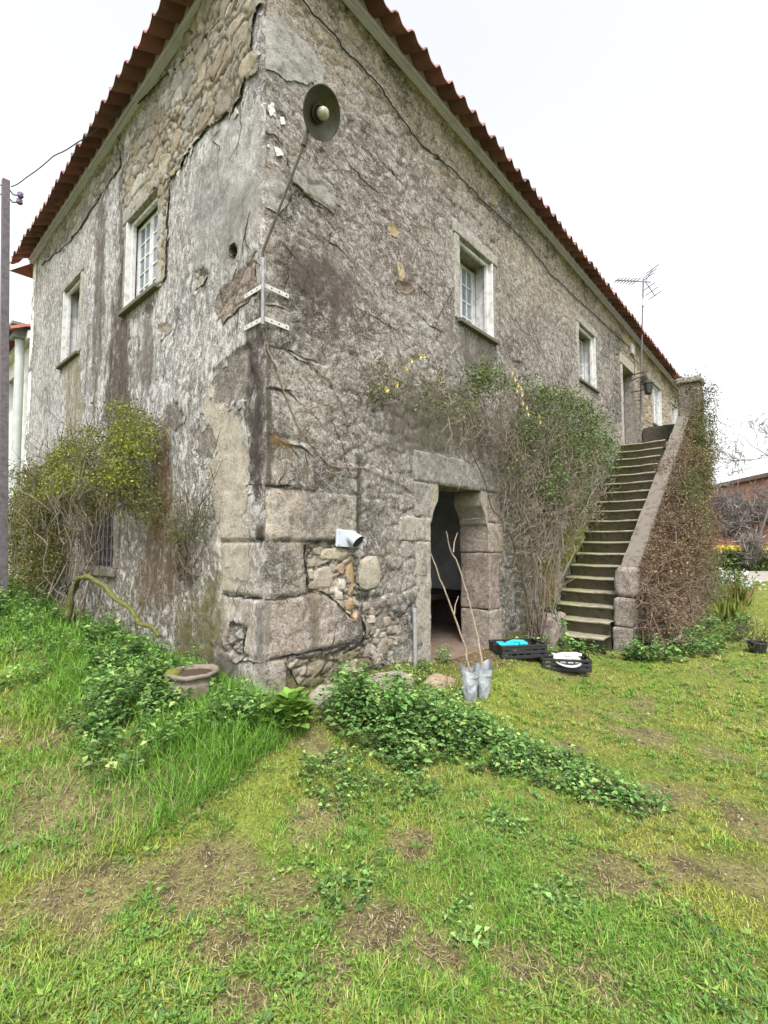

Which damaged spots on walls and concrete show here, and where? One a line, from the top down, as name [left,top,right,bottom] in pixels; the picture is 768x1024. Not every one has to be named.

flaking render [41,0,326,290]
crack [211,101,283,165]
crack [345,158,405,193]
crack [242,207,281,268]
damp [65,201,153,437]
flaking render [214,242,260,325]
flaking render [393,261,416,295]
crack [416,283,455,333]
damp [244,290,273,495]
damp [255,525,264,543]
flaking render [223,617,247,663]
flaking render [285,539,402,688]